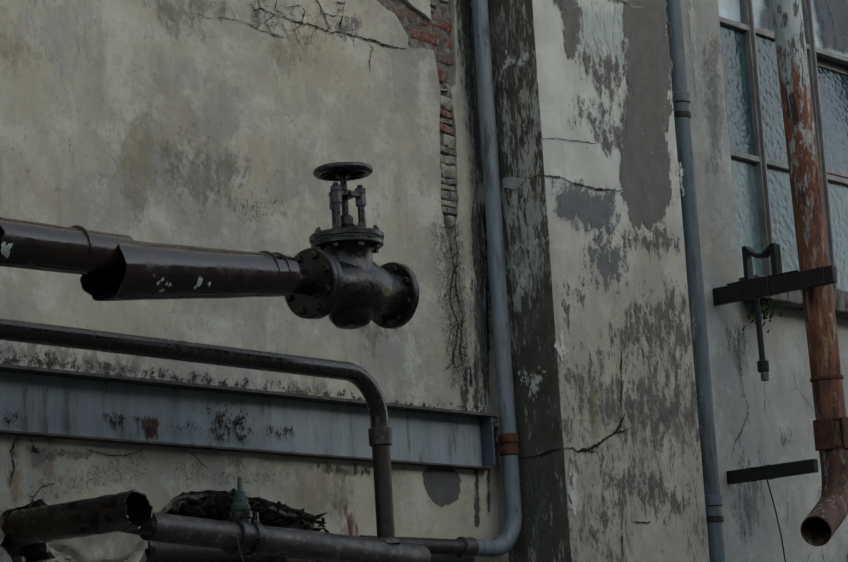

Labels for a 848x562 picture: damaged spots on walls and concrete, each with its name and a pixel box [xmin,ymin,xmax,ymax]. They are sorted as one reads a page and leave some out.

crack [188,0,406,72]
flaking render [386,0,473,390]
crack [527,174,621,192]
peeling [552,0,719,553]
corrosion [103,396,294,452]
crack [521,348,633,458]
crack [9,437,40,485]
crack [29,443,147,508]
water stain [422,466,461,507]
water stain [474,470,491,527]